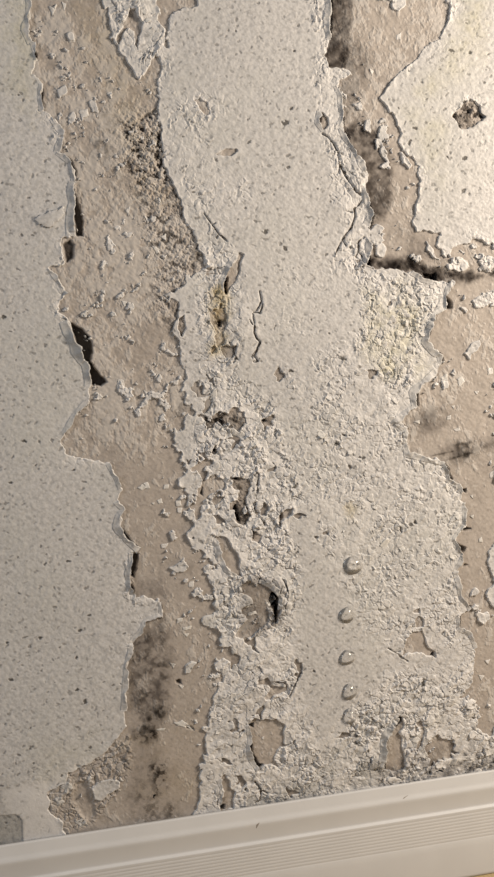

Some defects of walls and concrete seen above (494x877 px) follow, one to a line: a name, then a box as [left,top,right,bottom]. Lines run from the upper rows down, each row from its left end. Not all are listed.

leakage [326,0,350,67]
leakage [346,127,390,214]
leakage [367,257,439,277]
peeling [20,0,306,834]
peeling [314,0,494,784]